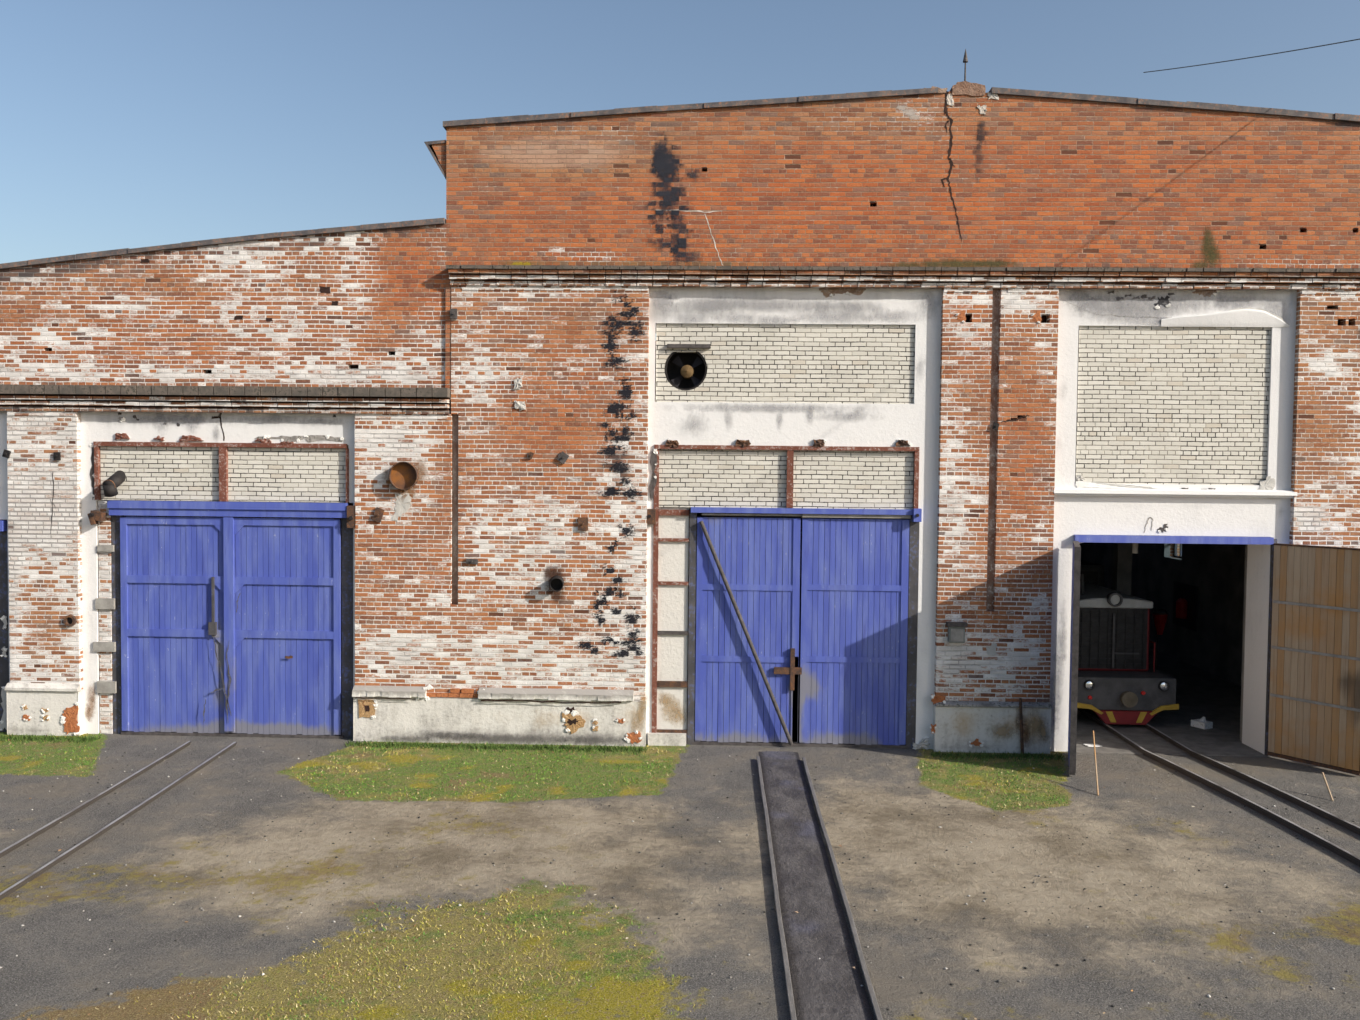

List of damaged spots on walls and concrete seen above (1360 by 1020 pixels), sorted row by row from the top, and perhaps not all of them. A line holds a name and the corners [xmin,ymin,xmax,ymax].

leakage [648,146,699,262]
crack [941,91,962,242]